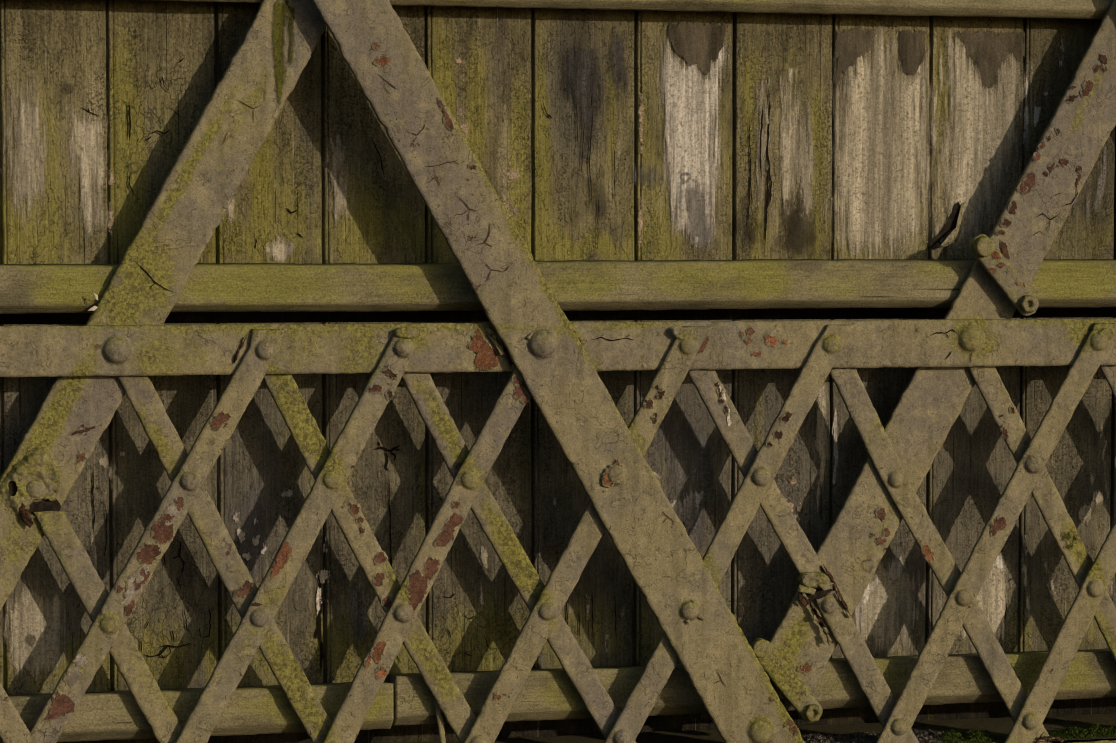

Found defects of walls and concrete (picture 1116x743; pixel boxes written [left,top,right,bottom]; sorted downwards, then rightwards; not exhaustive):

rust [1064,53,1108,104]
crack [747,78,772,254]
rust [988,128,1083,273]
rust [467,325,531,405]
rust [115,495,185,618]
rust [349,502,366,535]
rust [372,550,393,608]
rust [405,500,464,614]
rust [44,691,77,722]